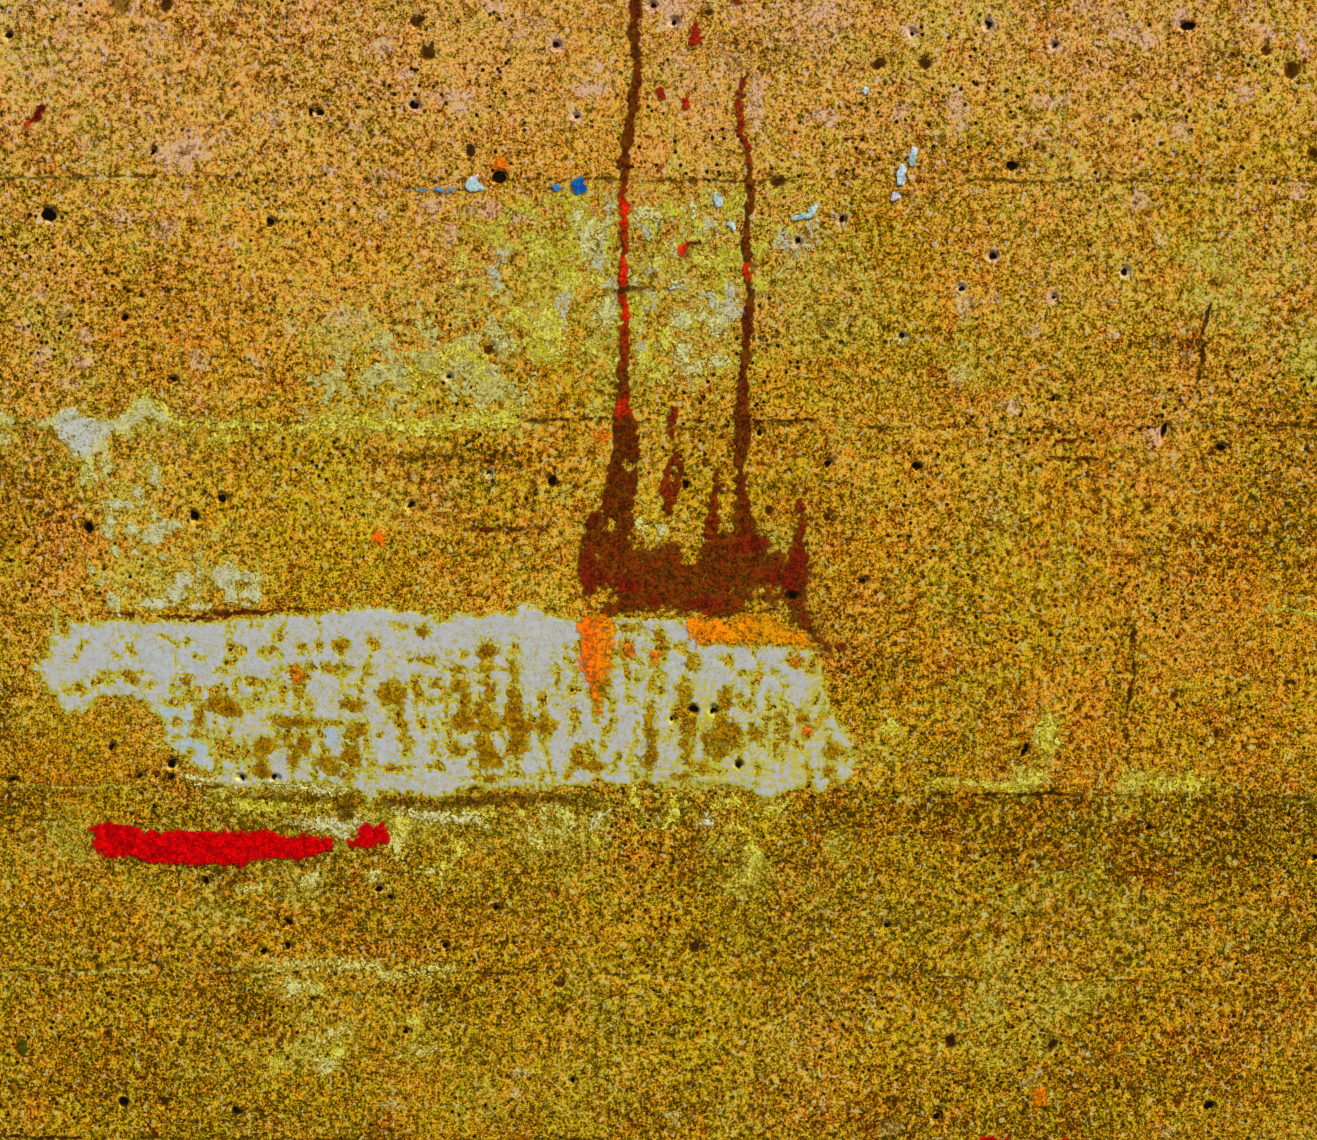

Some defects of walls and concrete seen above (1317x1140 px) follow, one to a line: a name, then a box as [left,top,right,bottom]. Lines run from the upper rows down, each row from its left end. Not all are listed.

corrosion [592,424,612,446]
peeling [27,598,860,819]